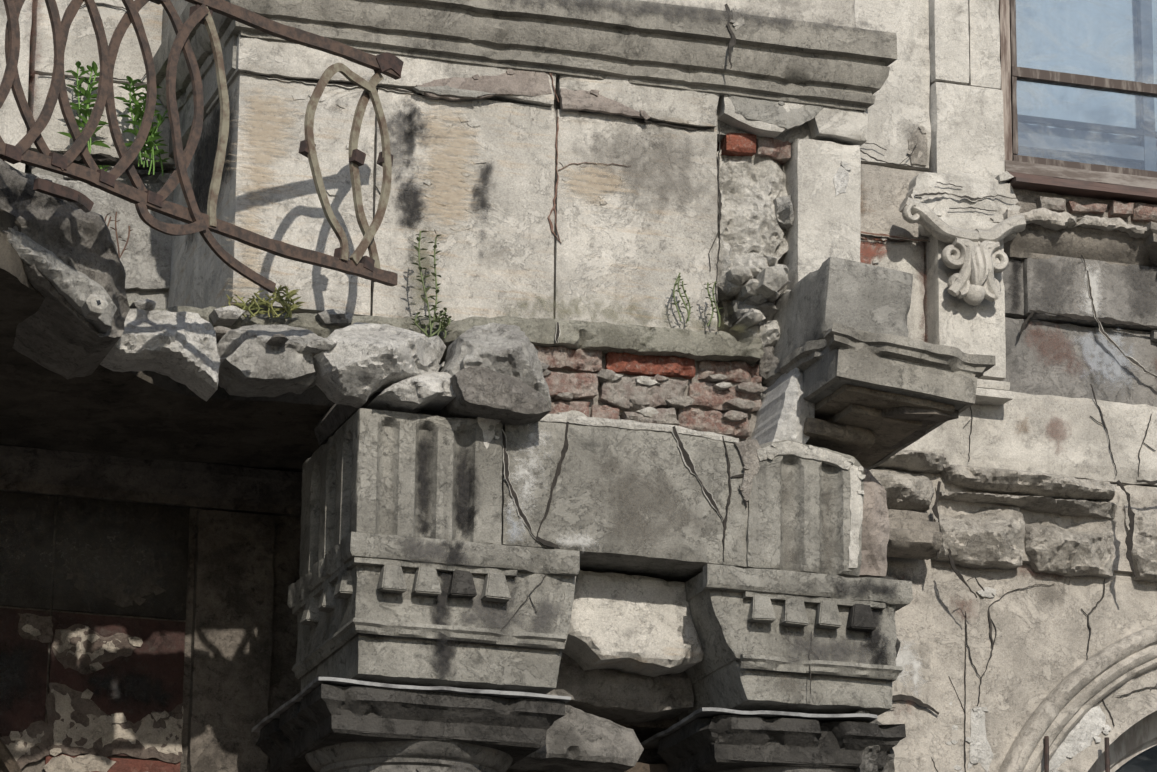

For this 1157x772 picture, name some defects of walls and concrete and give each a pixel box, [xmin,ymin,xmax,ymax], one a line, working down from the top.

water stain [473,164,492,209]
crack [860,143,1019,211]
rust [860,235,888,264]
flaking render [0,159,866,568]
crack [1020,255,1157,379]
crack [501,421,569,631]
crack [672,426,744,562]
crack [1090,384,1157,577]
peeling [18,613,143,675]
crack [931,481,1053,772]
peeling [0,683,184,772]
peeling [1049,706,1111,772]